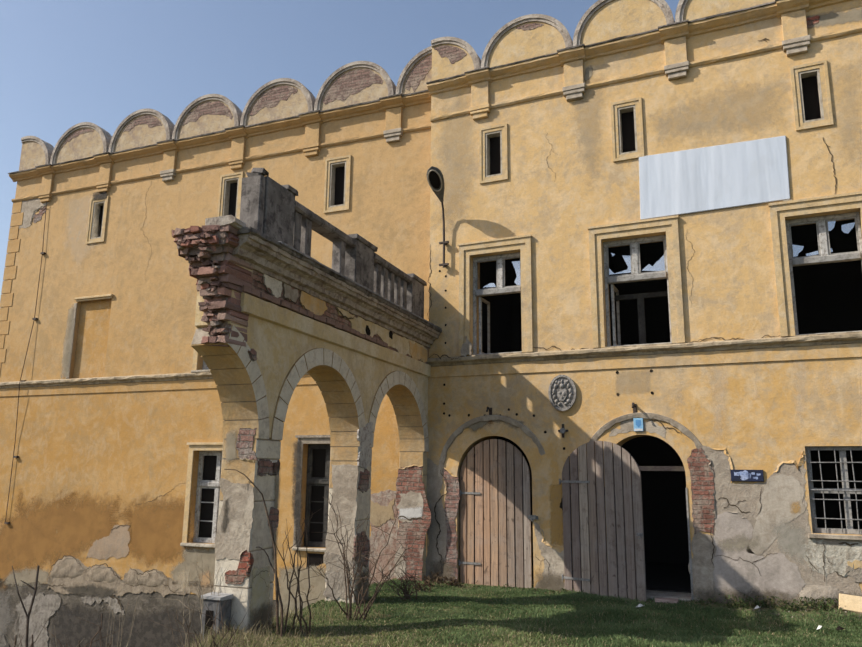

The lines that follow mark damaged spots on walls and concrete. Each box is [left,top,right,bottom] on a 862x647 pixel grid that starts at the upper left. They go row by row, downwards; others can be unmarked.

crack [823,138,837,194]
flaking render [14,198,49,229]
flaking render [236,428,280,477]
flaking render [323,422,460,600]
crack [719,487,762,514]
flaking render [687,445,862,599]
damp [0,493,194,636]
flaking render [14,524,214,647]
flaking render [225,549,254,584]
crack [710,532,776,576]